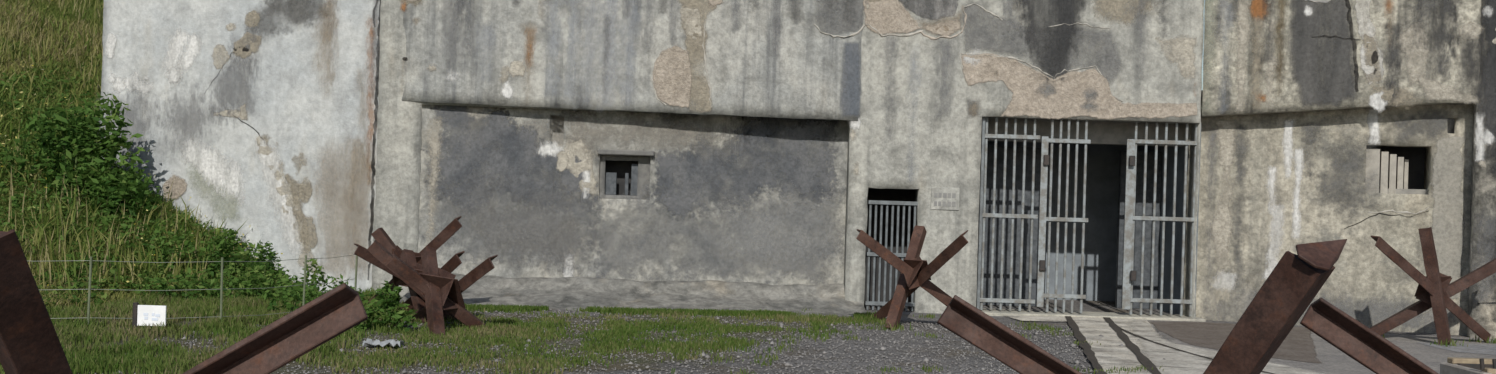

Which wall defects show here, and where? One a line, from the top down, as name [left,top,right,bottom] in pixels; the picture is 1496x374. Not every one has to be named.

spalling [212,10,261,69]
damp [247,0,327,35]
spalling [814,0,1197,120]
damp [1016,0,1085,80]
damp [1204,0,1356,110]
peeling [1355,0,1477,111]
peeling [1459,22,1496,44]
damp [1264,0,1496,279]
peeling [1210,120,1246,284]